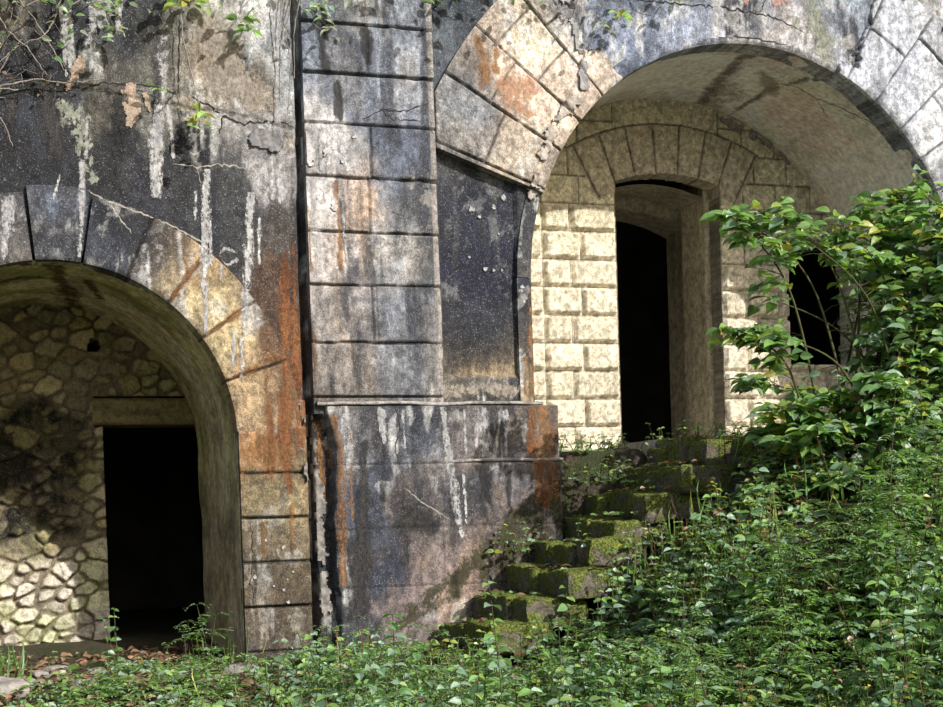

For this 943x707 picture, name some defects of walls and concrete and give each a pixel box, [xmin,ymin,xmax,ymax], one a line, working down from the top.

leakage [59,0,75,77]
spalling [56,56,85,91]
spalling [121,82,151,128]
crack [1,16,293,134]
leakage [150,35,175,198]
corrosion [473,35,538,118]
crack [636,0,803,32]
leakage [77,120,89,257]
corrosion [207,309,245,336]
corrosion [233,244,353,586]
leakage [440,407,512,538]
corrosion [524,307,561,509]